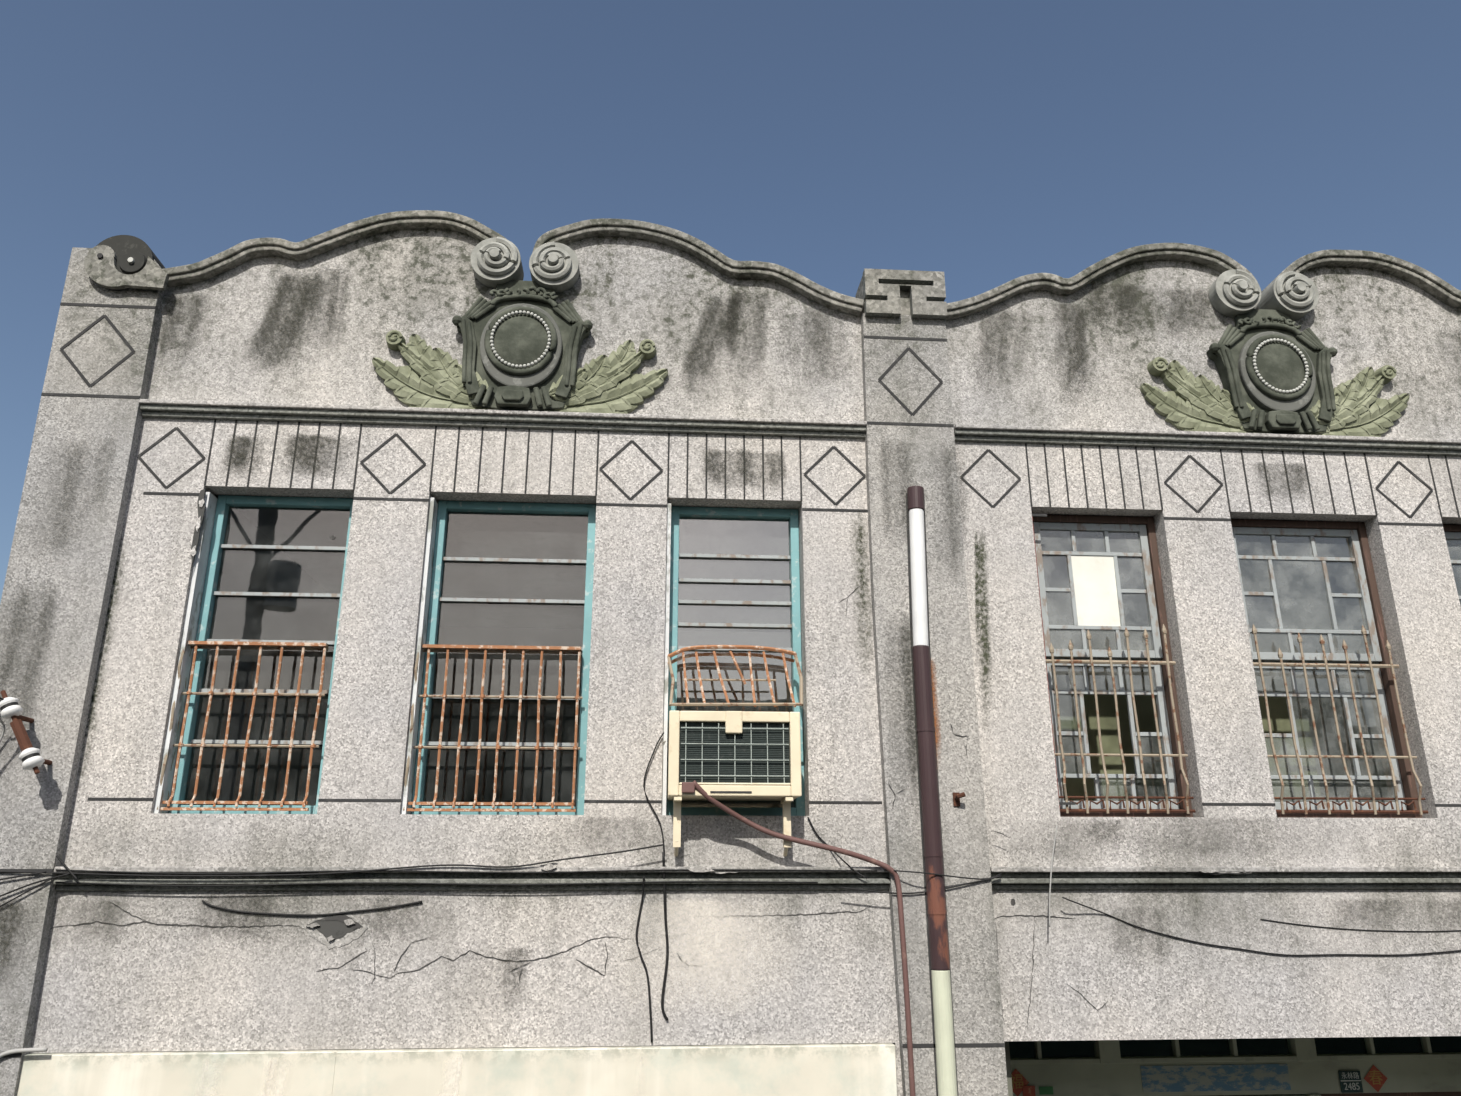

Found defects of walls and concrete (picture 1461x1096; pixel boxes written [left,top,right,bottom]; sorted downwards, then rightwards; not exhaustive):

crack [684,908,879,918]
crack [316,936,730,985]